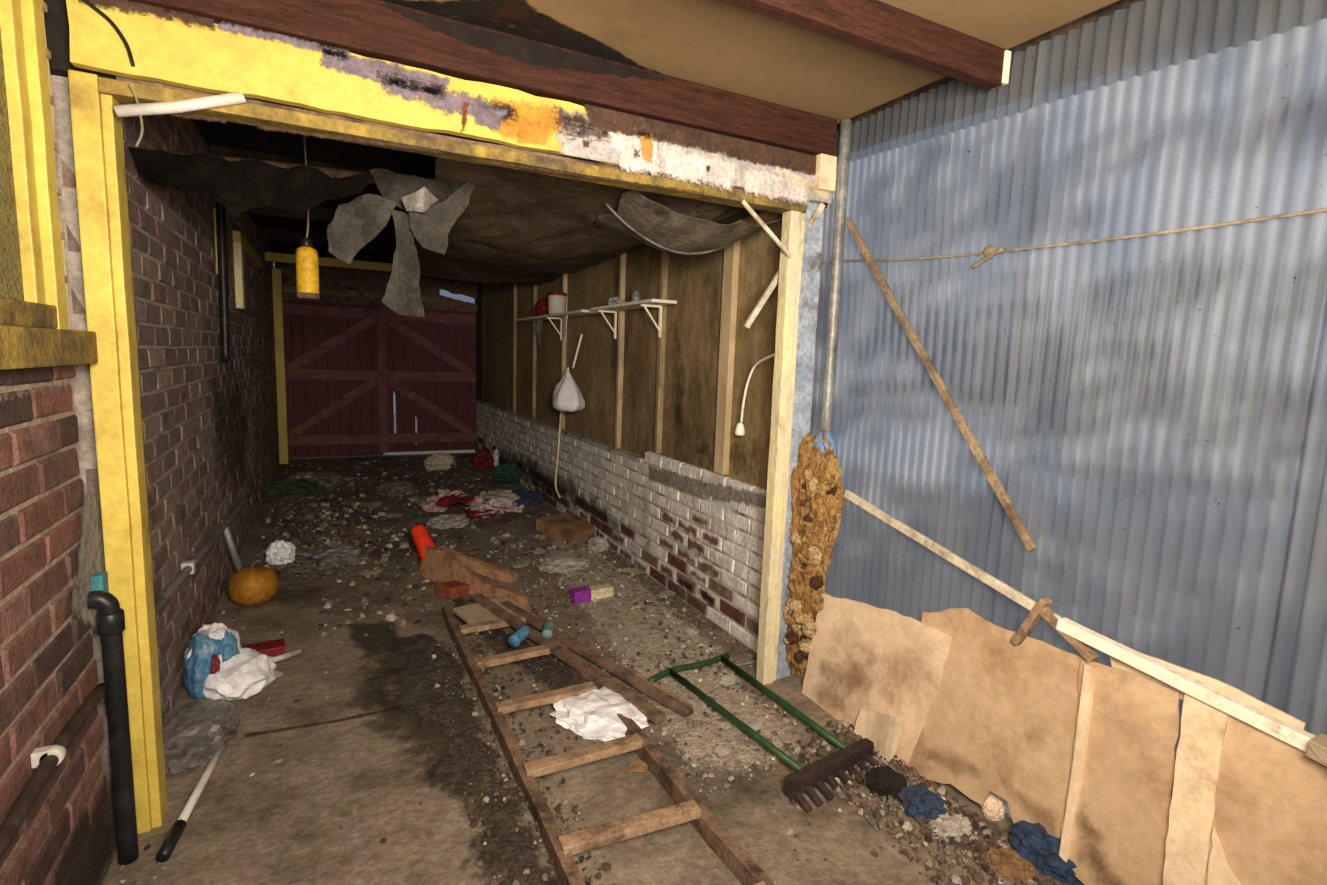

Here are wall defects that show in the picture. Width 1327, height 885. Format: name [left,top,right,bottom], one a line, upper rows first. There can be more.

peeling [78,0,836,205]
water stain [381,0,663,80]